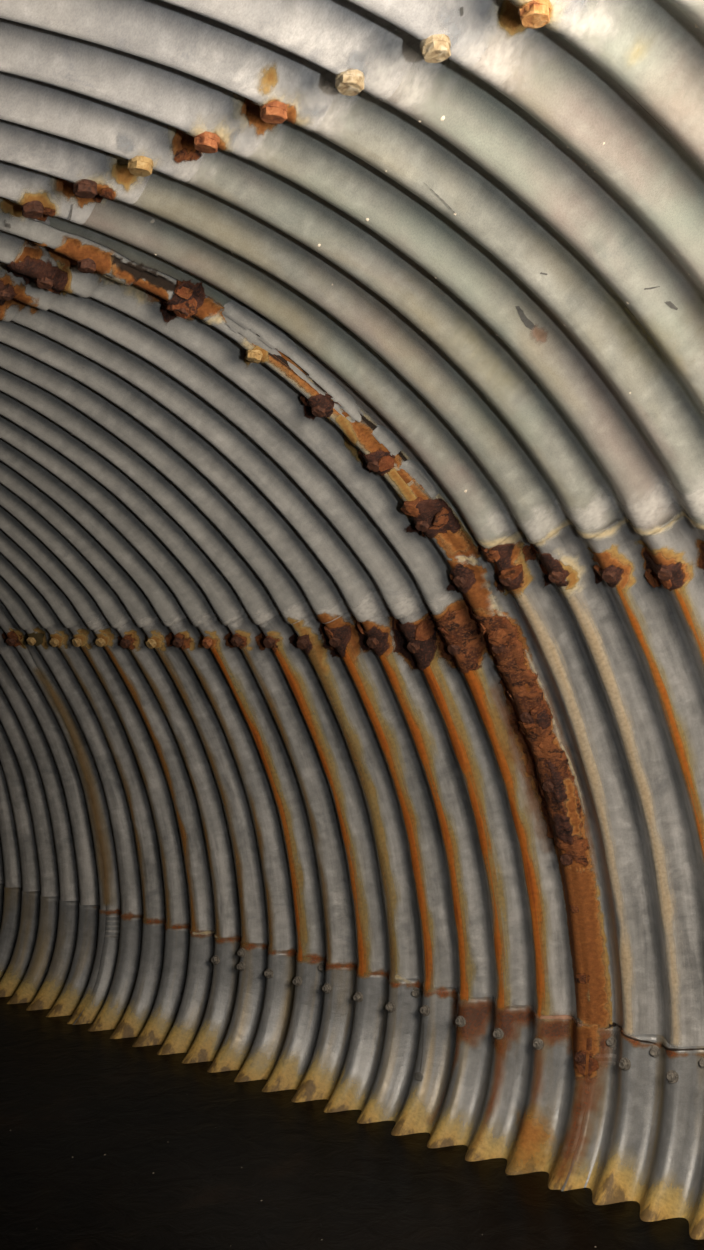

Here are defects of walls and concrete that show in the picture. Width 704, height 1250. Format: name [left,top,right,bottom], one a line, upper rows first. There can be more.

corrosion [498,0,532,36]
corrosion [169,66,310,163]
corrosion [0,154,139,228]
corrosion [0,236,225,325]
corrosion [1,334,704,1179]